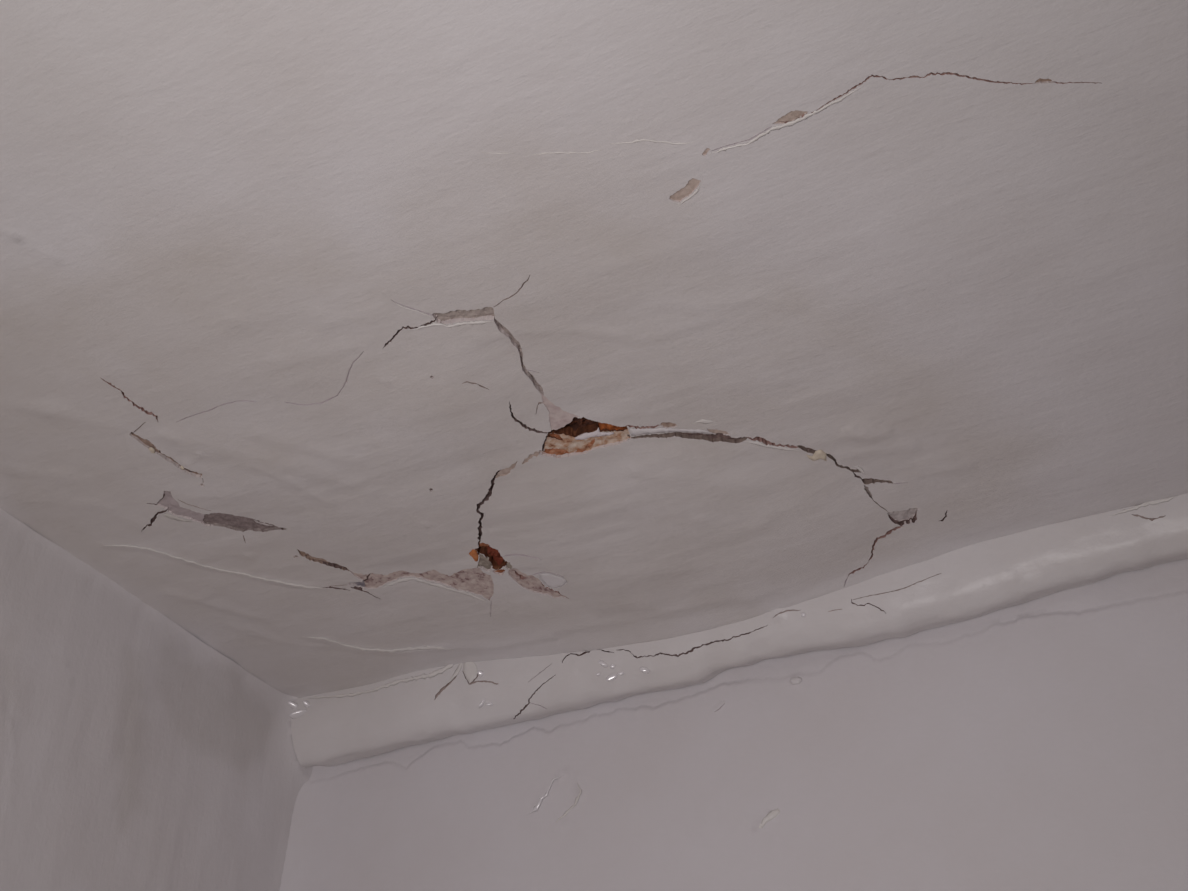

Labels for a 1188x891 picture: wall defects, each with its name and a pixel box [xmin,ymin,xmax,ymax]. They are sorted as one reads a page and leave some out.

crack [482,72,1098,156]
spalling [669,178,702,205]
crack [101,378,255,487]
crack [286,276,548,546]
spalling [539,394,631,458]
spalling [142,491,286,543]
crack [626,419,941,612]
crack [293,549,350,571]
peeling [323,538,569,617]
crack [514,610,800,719]